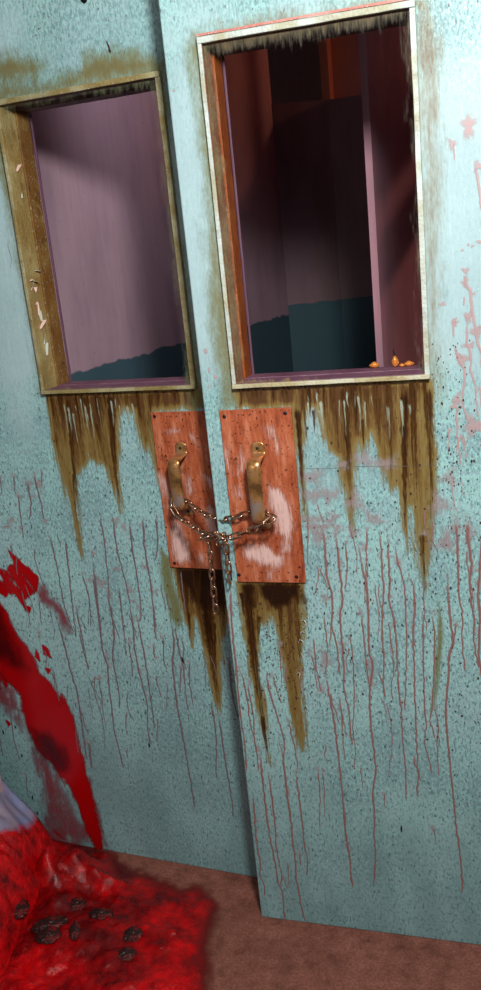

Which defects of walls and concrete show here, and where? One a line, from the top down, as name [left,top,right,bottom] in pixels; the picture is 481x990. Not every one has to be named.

corrosion [45,388,204,581]
corrosion [155,340,481,763]